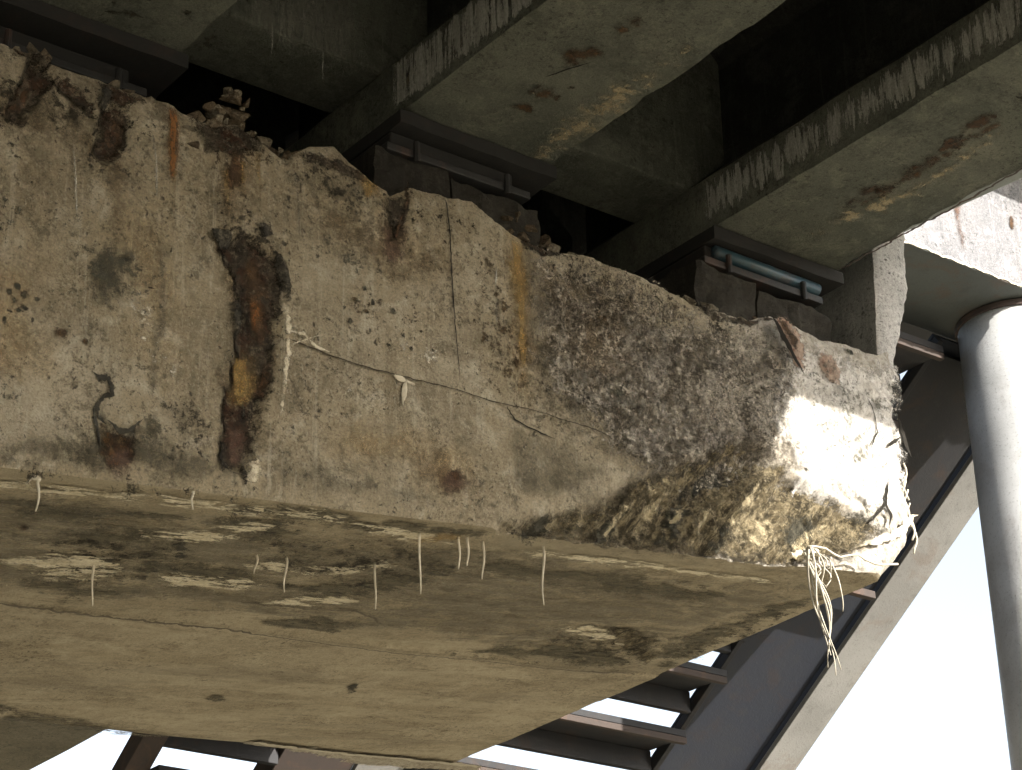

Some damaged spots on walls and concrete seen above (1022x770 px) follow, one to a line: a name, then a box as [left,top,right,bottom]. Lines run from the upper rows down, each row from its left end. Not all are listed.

spalling [6,42,156,162]
rust [167,108,180,179]
spalling [180,87,377,187]
rust [844,114,1001,208]
water stain [217,193,292,256]
spalling [383,183,410,263]
rust [841,168,1022,269]
crack [290,199,666,461]
spalling [500,211,905,567]
crack [868,399,911,456]
water stain [0,392,823,674]
crack [866,478,893,526]